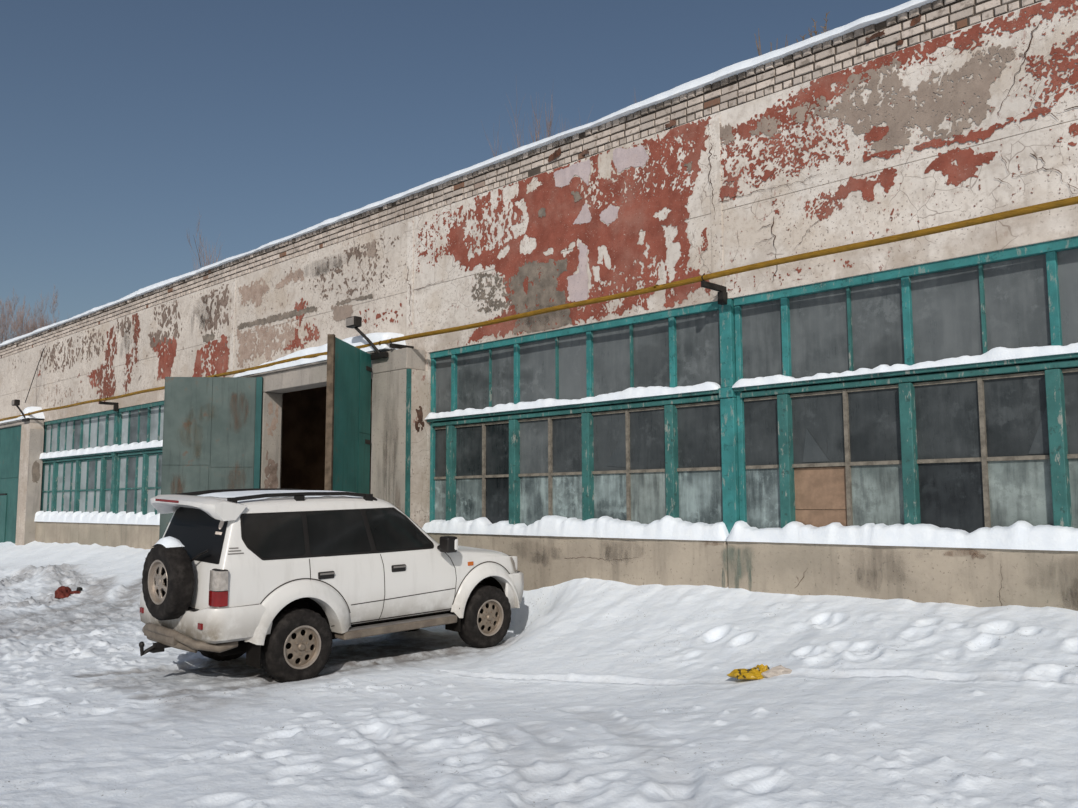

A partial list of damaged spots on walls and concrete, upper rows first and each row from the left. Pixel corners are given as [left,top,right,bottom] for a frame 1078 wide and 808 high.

crack [998,24,1039,125]
peeling [192,0,1078,377]
crack [708,144,820,219]
crack [994,153,1078,194]
crack [700,217,819,282]
peeling [38,300,182,406]